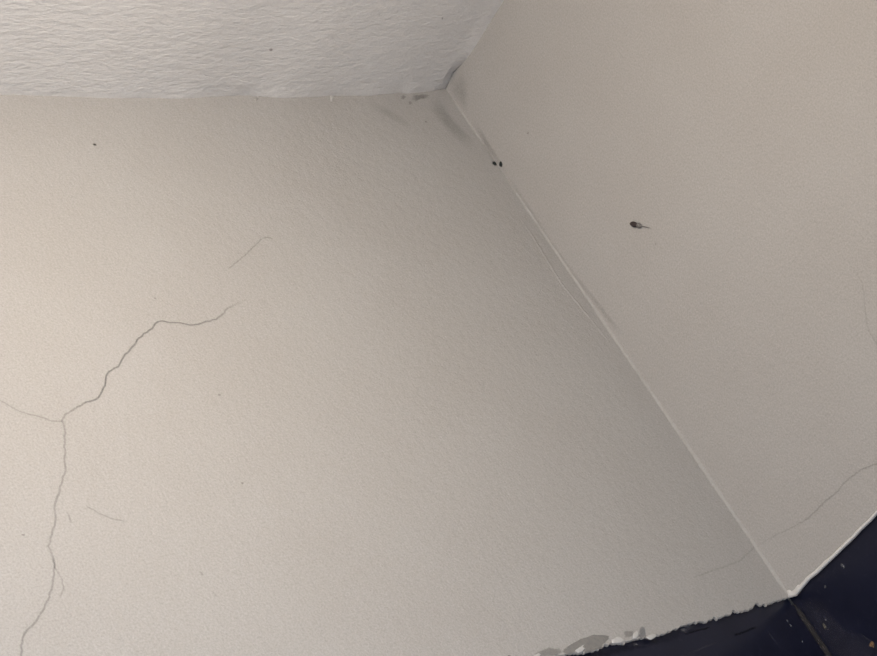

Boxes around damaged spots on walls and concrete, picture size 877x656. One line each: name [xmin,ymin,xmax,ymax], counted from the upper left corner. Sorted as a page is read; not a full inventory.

peeling [563,627,657,654]